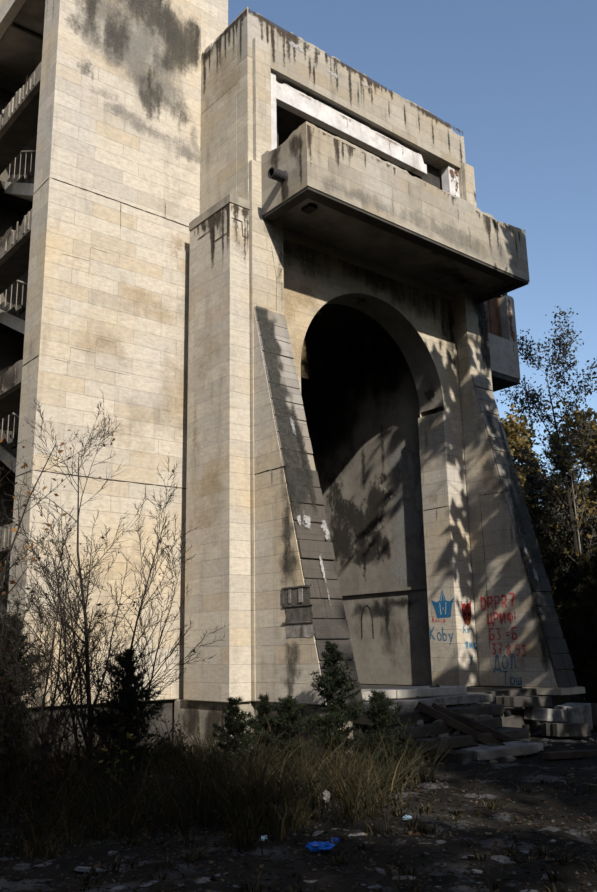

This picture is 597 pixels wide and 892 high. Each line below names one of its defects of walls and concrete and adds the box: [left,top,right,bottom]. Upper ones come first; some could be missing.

leakage [74,0,393,121]
leakage [271,125,312,182]
leakage [323,132,366,164]
leakage [404,102,463,162]
leakage [281,175,289,200]
leakage [194,203,249,262]
leakage [476,211,520,260]
leakage [290,405,316,510]
leakage [281,502,297,576]
leakage [355,599,411,640]
leakage [287,645,297,694]